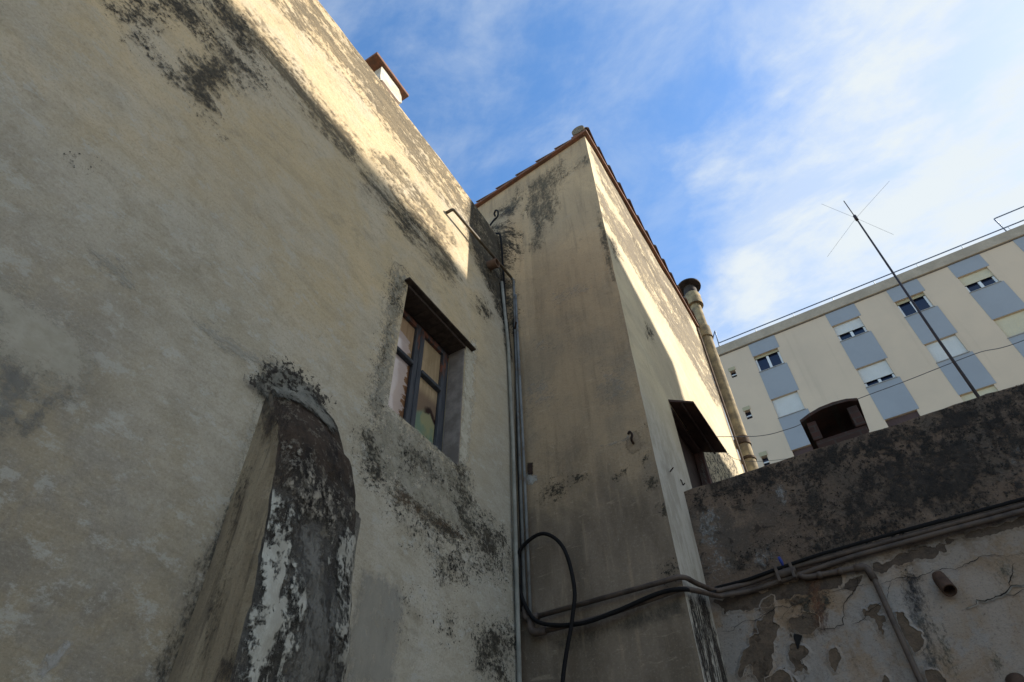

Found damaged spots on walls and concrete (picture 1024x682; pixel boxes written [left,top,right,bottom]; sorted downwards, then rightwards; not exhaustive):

water stain [100,0,564,361]
peeling [234,441,357,682]
water stain [379,481,516,682]
water stain [684,384,1024,571]
flaking render [688,514,1024,682]
crack [816,553,1024,631]